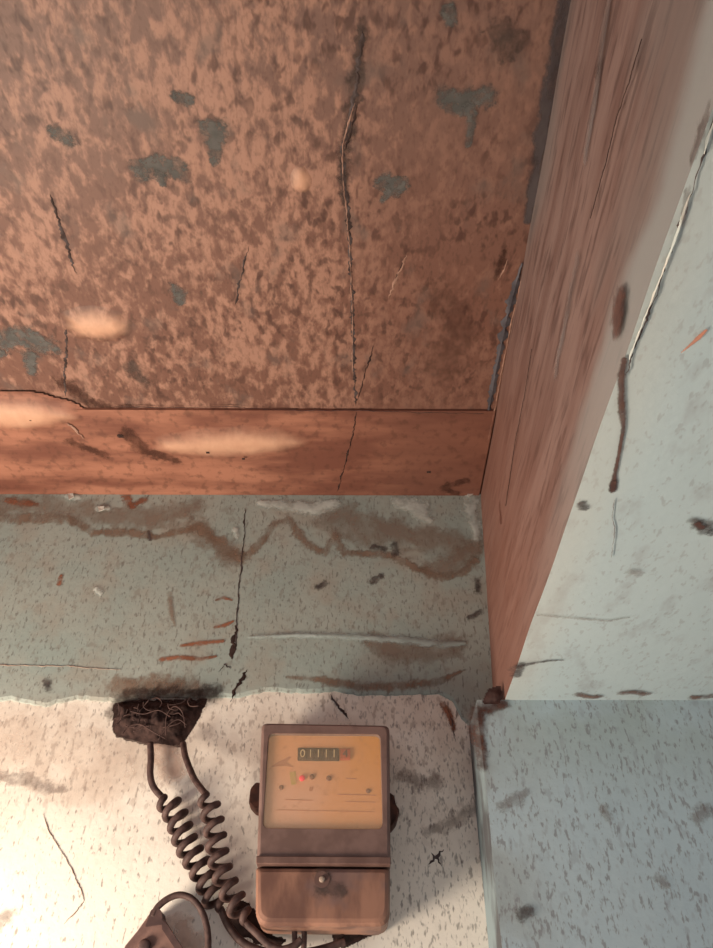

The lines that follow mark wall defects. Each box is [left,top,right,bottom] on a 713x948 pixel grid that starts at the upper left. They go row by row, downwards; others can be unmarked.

peeling [129,153,188,187]
peeling [197,119,229,166]
crack [50,194,75,271]
crack [116,20,484,489]
crack [626,121,713,373]
peeling [0,327,60,375]
rust [609,357,627,493]
damp [0,498,480,592]
crack [220,511,247,702]
damp [113,675,198,696]
rust [440,703,456,742]
rust [469,700,508,769]